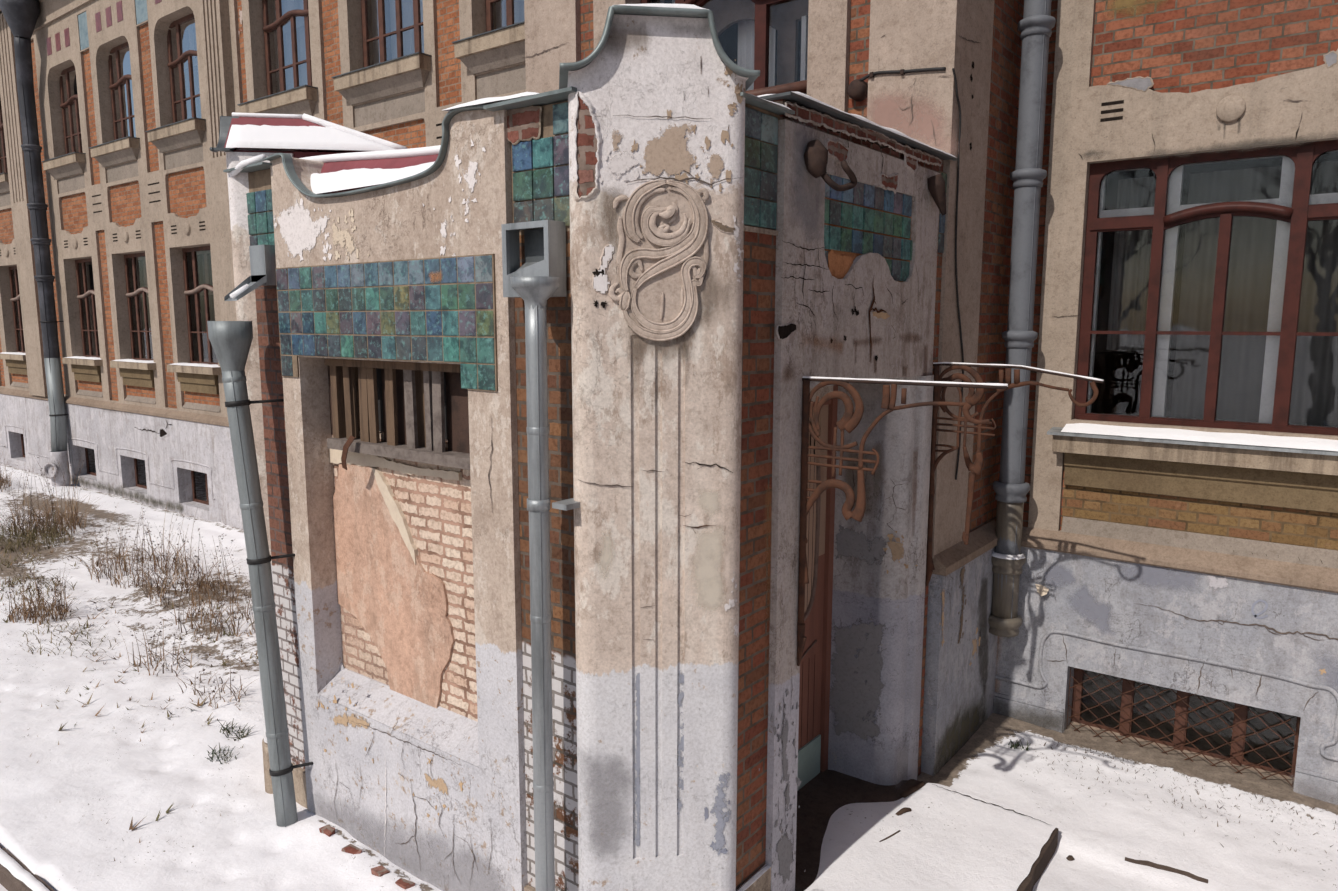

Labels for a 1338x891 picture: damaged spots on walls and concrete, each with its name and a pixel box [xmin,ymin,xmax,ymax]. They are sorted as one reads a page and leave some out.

spalling [569,59,745,202]
peeling [274,196,369,262]
crack [781,240,919,362]
damp [846,447,881,512]
flaking render [329,448,462,708]
crack [1134,603,1338,641]
crack [1197,663,1262,693]
peeling [704,773,731,856]